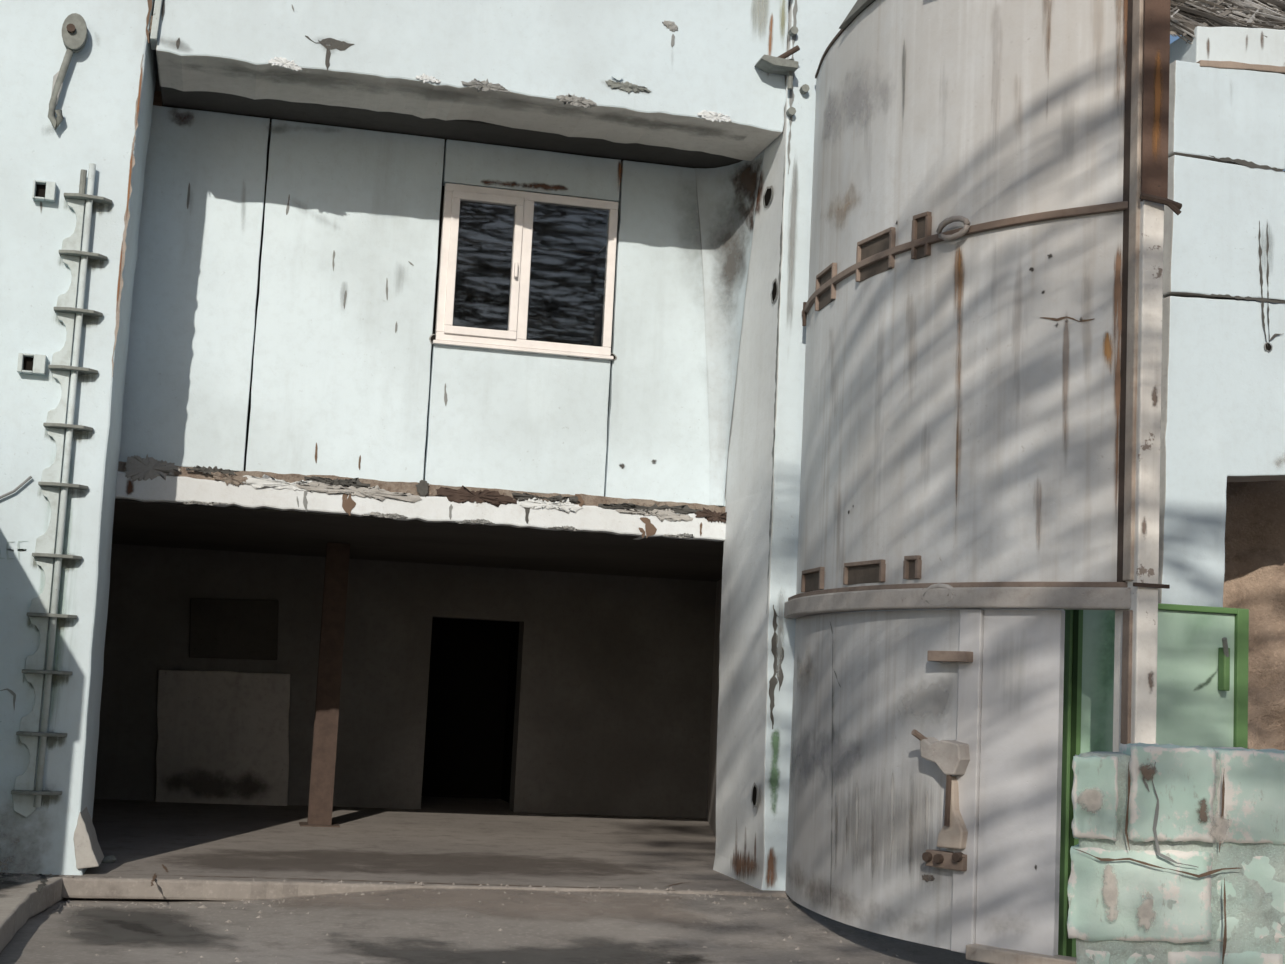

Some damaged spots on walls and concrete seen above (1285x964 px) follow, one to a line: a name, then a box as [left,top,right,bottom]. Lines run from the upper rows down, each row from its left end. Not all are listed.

spalling [416,73,441,84]
spalling [461,78,510,93]
spalling [556,93,597,109]
spalling [605,77,652,94]
spalling [697,110,732,122]
corrosion [954,248,964,389]
corrosion [1104,251,1122,498]
spalling [125,454,727,539]
peeling [769,605,784,729]
crack [1073,762,1240,964]